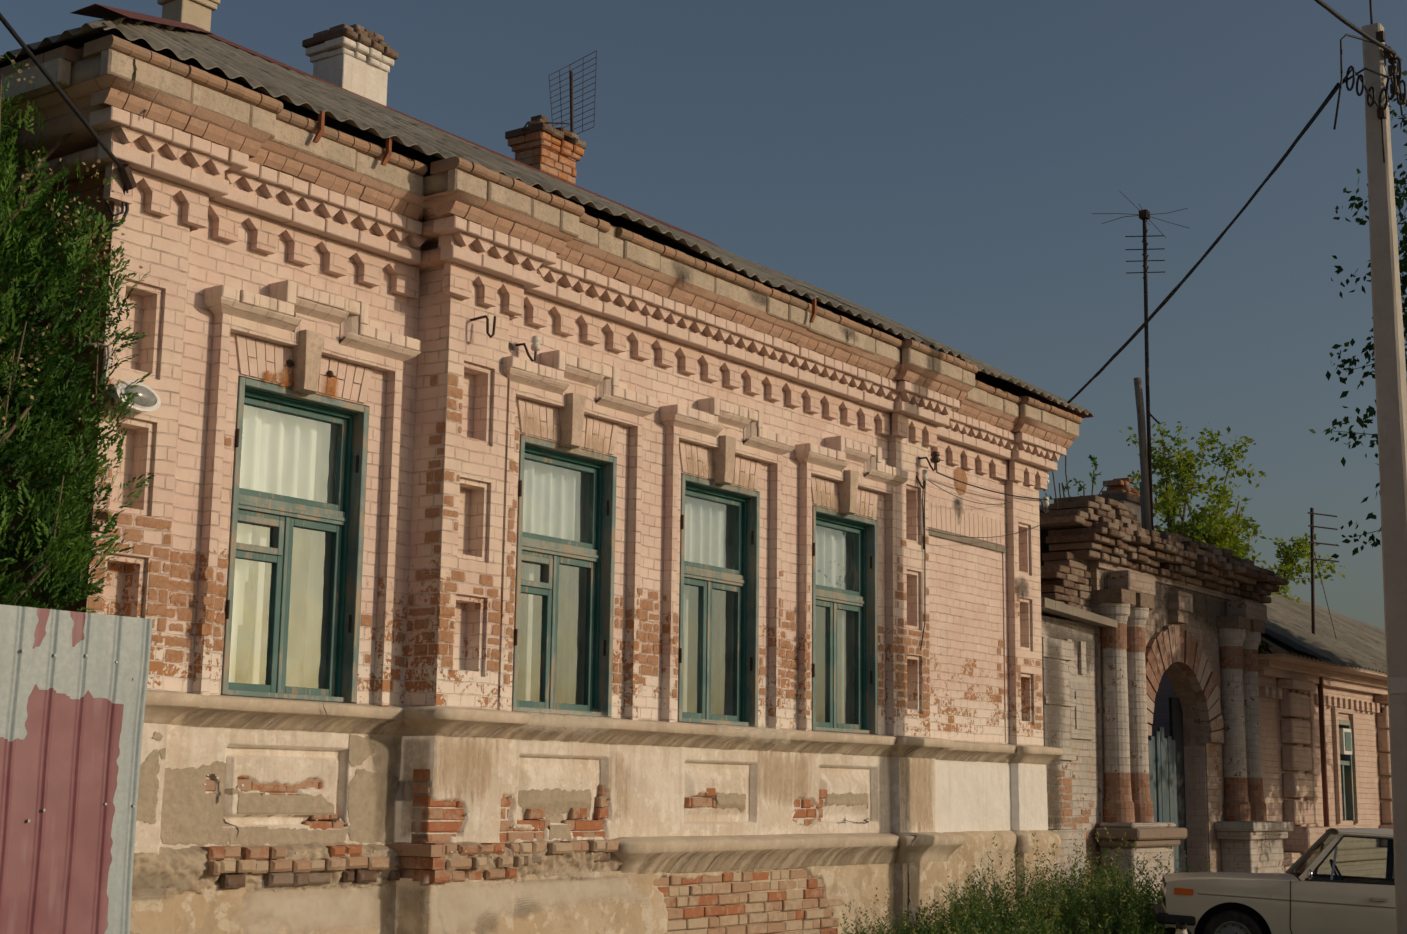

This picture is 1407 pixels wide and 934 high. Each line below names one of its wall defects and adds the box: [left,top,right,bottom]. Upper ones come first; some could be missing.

peeling [88,466,229,663]
peeling [613,588,679,698]
peeling [136,732,470,857]
peeling [490,785,612,859]
spalling [653,867,845,934]